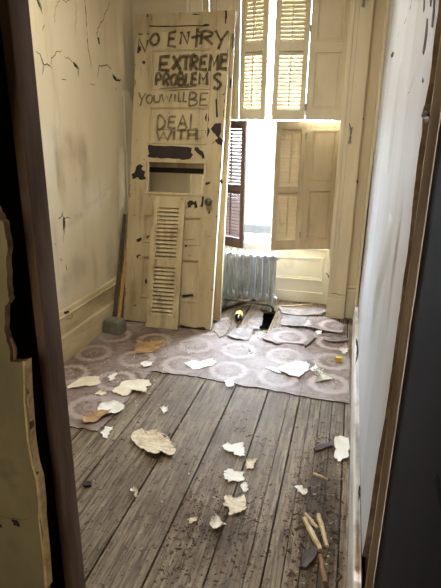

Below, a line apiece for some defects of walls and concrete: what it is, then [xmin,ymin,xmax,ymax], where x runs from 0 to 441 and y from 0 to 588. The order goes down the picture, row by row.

crack [35,0,120,89]
flaking render [23,357,52,588]